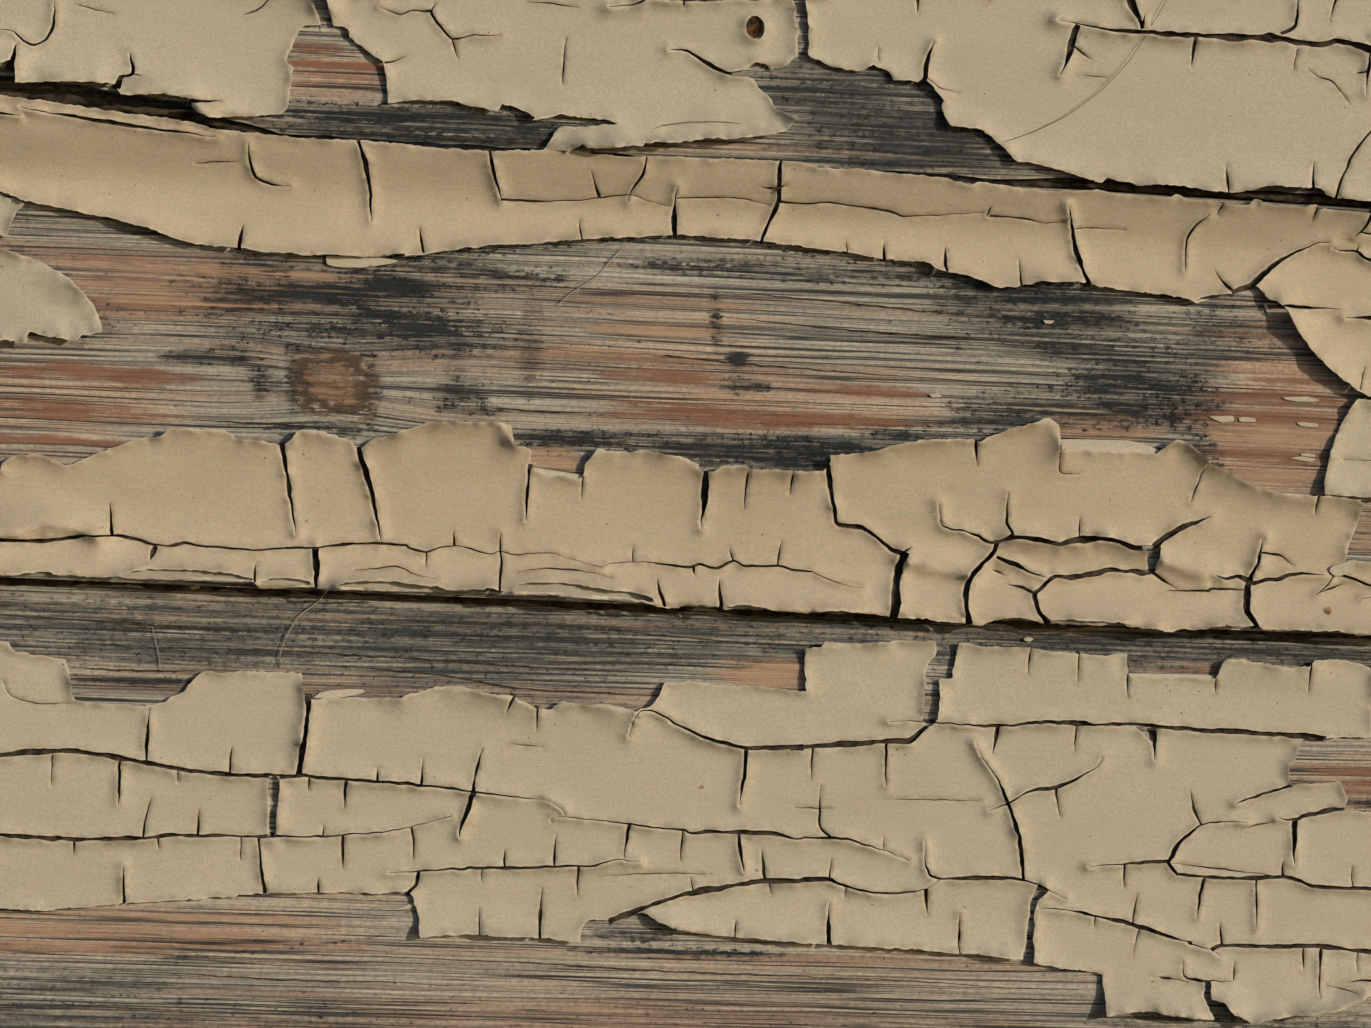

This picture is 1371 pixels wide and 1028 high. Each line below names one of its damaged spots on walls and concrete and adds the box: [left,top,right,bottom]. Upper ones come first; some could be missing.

crack [2,2,112,72]
crack [0,54,282,186]
crack [354,137,372,215]
peeling [0,0,1371,636]
crack [793,0,809,58]
crack [486,148,1120,288]
crack [1059,0,1371,96]
crack [1185,131,1371,320]
crack [0,407,911,646]
crack [939,467,1371,667]
crack [0,615,1371,1016]
peeling [0,637,1371,1025]